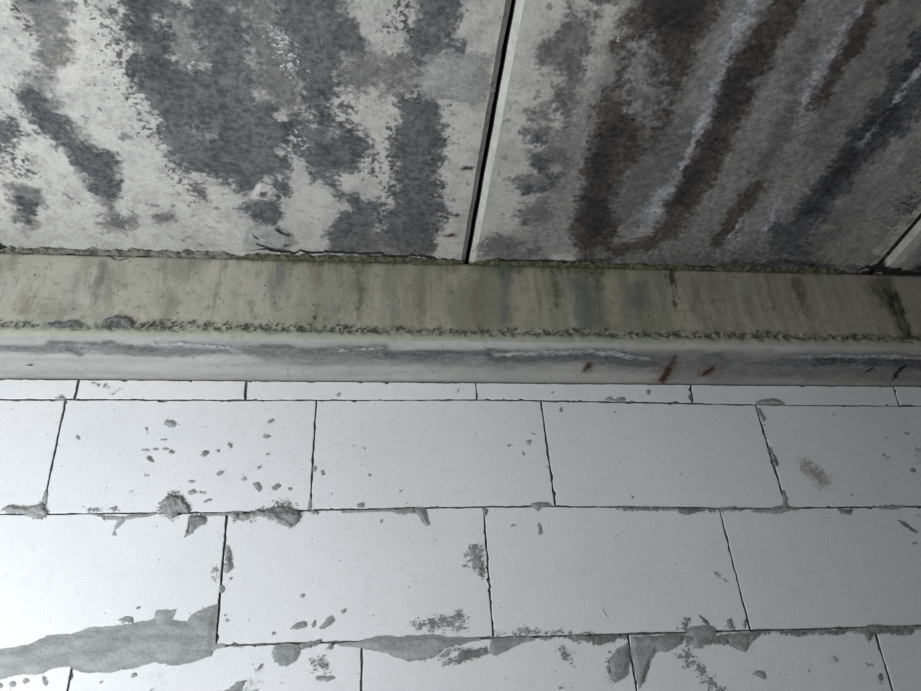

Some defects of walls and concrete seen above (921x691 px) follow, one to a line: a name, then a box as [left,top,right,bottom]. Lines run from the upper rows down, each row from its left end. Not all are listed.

damp [0,0,135,230]
damp [91,0,466,259]
damp [477,0,921,273]
crack [252,248,436,260]
peeling [167,480,239,537]
peeling [239,475,297,507]
peeling [300,639,334,682]
peeling [675,615,748,651]